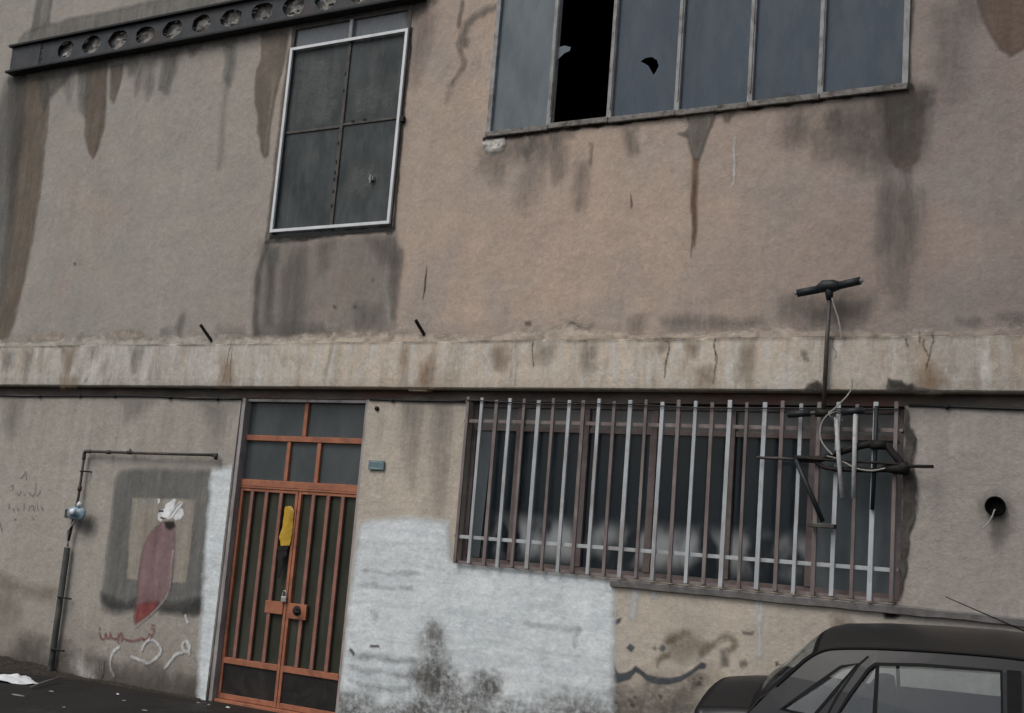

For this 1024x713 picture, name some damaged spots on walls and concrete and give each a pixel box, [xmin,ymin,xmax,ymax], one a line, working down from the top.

water stain [79,64,140,157]
water stain [255,32,288,156]
water stain [0,76,67,342]
crack [467,340,535,364]
crack [635,338,686,377]
crack [803,332,959,368]
water stain [412,643,486,713]